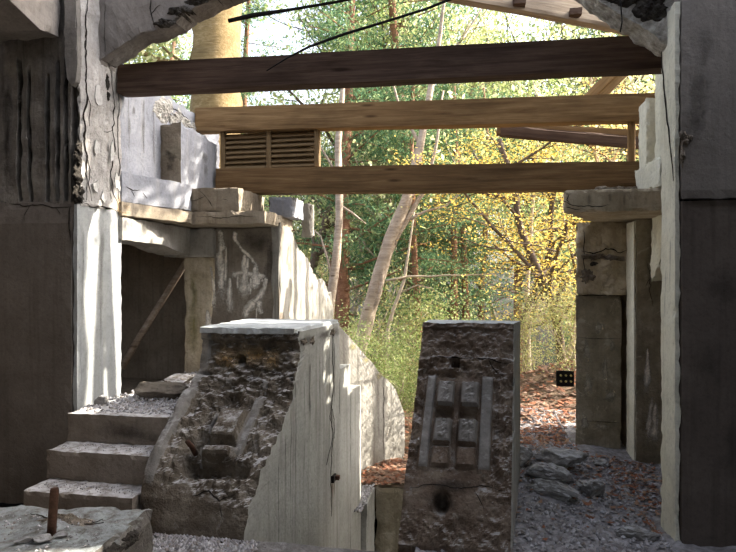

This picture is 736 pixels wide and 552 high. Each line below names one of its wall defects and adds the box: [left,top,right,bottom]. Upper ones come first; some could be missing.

spalling [153,0,234,28]
spalling [606,0,668,22]
peeling [95,74,110,105]
crack [1,0,147,242]
spalling [153,96,206,136]
crack [661,51,674,181]
spalling [72,139,107,204]
crack [564,195,606,210]
crack [583,235,627,270]
crack [326,344,335,516]